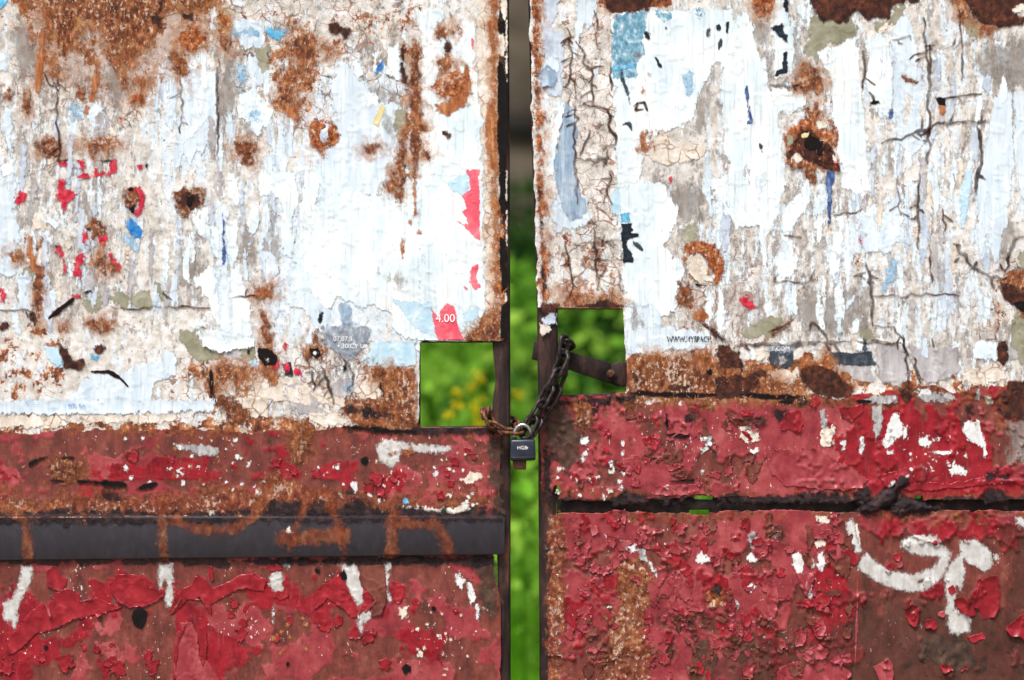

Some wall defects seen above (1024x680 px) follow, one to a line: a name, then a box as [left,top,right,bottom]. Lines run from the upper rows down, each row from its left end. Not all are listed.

rust [0,0,233,115]
peeling [179,315,382,428]
rust [383,10,473,203]
rust [465,0,503,341]
peeling [475,0,508,322]
rust [531,0,624,318]
crack [560,11,650,297]
peeling [675,222,725,323]
rust [630,323,855,409]
peeling [577,250,1024,496]
crack [741,17,1017,385]
peeling [565,509,860,680]